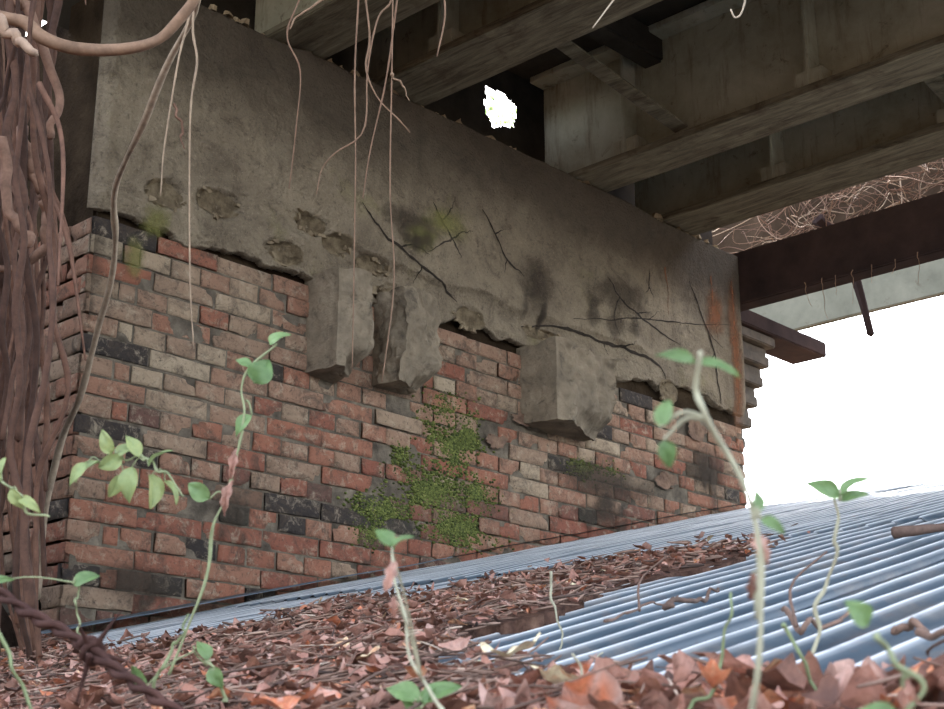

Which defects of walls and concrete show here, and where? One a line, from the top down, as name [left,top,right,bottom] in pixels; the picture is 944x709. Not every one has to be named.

spalling [144,178,240,220]
spalling [266,239,304,267]
spalling [294,208,393,298]
spalling [451,306,485,333]
corrosion [709,276,742,419]
spalling [659,379,678,405]
water stain [337,456,515,558]